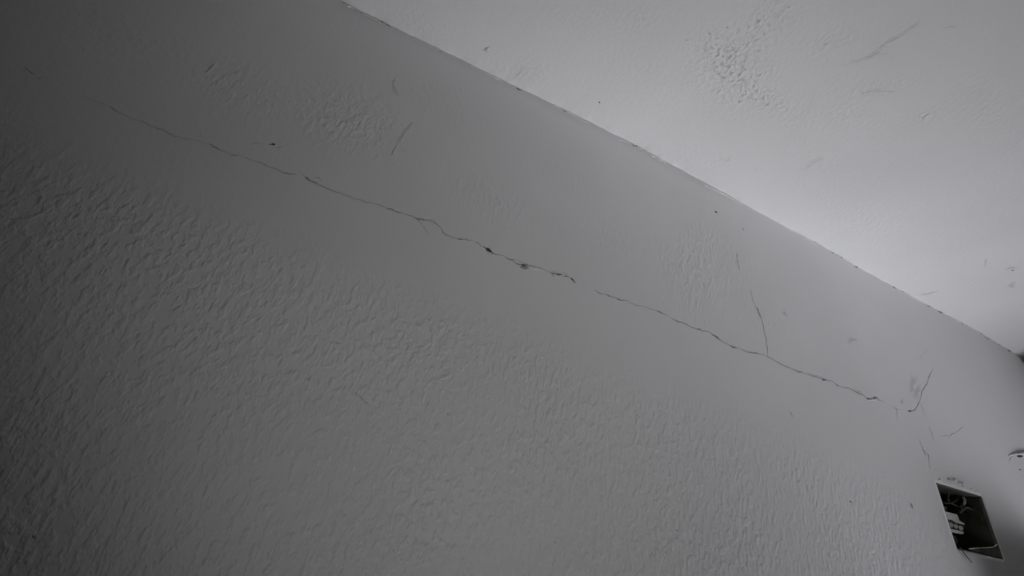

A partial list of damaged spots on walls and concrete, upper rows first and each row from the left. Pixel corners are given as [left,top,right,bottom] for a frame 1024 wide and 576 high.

crack [82,95,956,460]